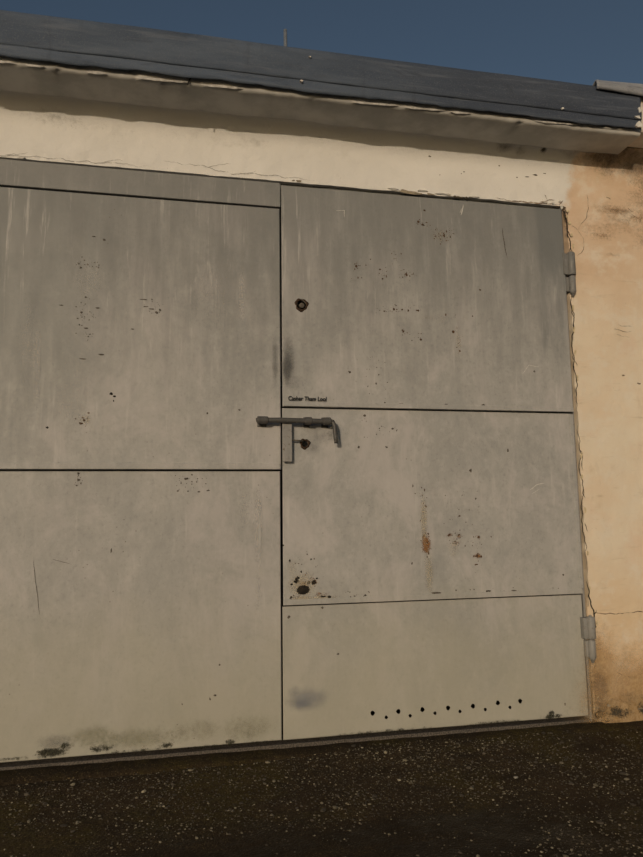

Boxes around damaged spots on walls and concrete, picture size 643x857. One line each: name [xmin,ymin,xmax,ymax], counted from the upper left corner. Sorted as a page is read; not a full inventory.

corrosion [422,532,430,562]
water stain [591,650,643,723]